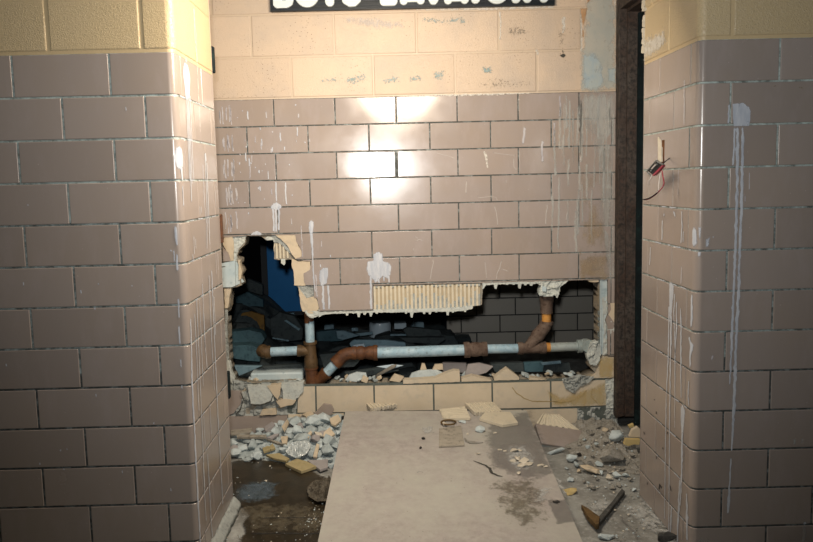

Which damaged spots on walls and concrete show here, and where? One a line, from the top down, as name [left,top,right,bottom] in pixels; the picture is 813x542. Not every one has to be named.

spalling [223,236,246,280]
spalling [265,235,537,318]
spalling [224,287,314,453]
spalling [403,366,546,384]
spalling [562,356,618,425]
water stain [231,460,327,542]